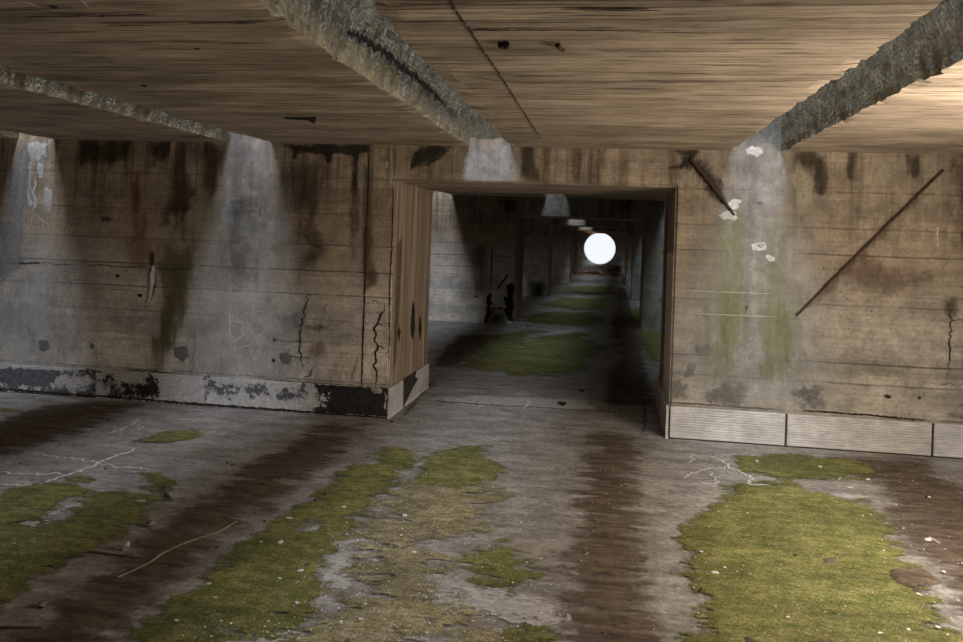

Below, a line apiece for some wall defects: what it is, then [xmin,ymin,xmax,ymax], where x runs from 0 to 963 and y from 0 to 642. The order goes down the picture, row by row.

crack [450,0,773,139]
leakage [80,140,128,170]
leakage [152,141,193,223]
leakage [677,150,698,168]
leakage [906,154,919,177]
crack [226,186,394,388]
spalling [475,283,515,321]
leakage [695,149,827,408]
rust [796,169,945,316]
crack [941,297,963,388]
peeling [0,366,388,417]
crack [0,379,963,486]